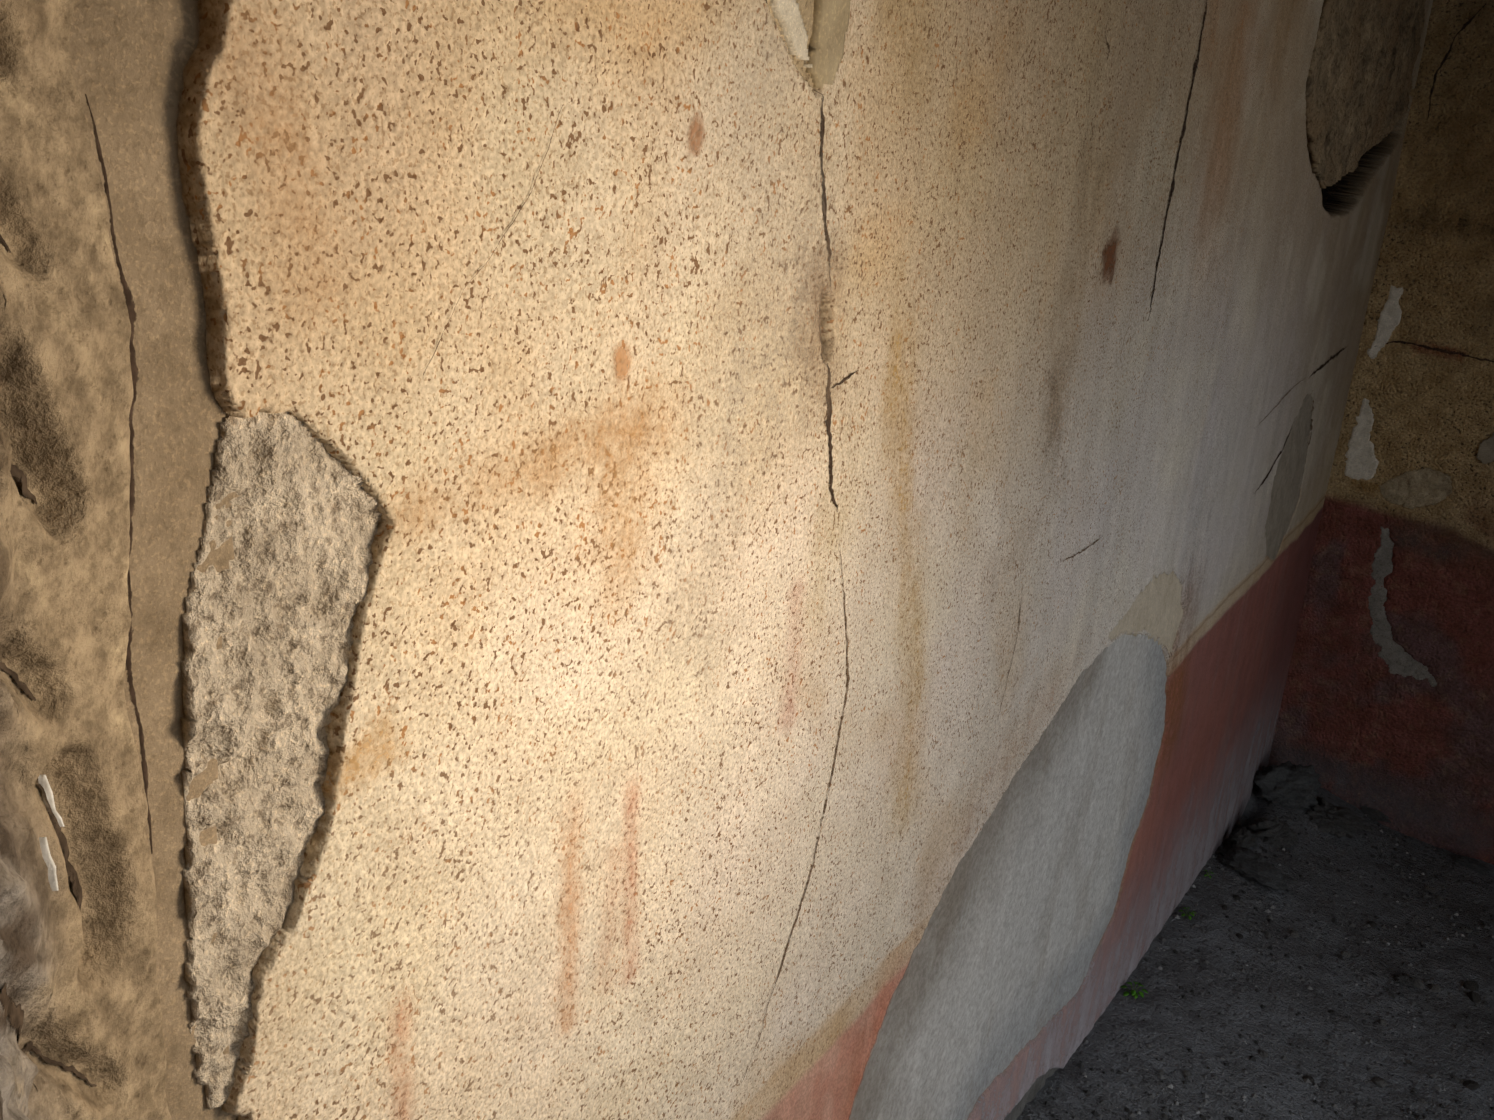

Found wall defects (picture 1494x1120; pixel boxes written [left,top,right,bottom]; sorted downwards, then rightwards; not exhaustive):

flaking render [766,0,819,93]
crack [85,94,153,854]
flaking render [0,0,382,1120]
crack [813,89,832,287]
crack [825,365,858,512]
rust [1103,237,1117,282]
crack [1148,2,1207,320]
peeling [1265,394,1312,560]
crack [1375,340,1494,362]
crack [743,554,850,1080]
flaking render [849,571,1183,1120]